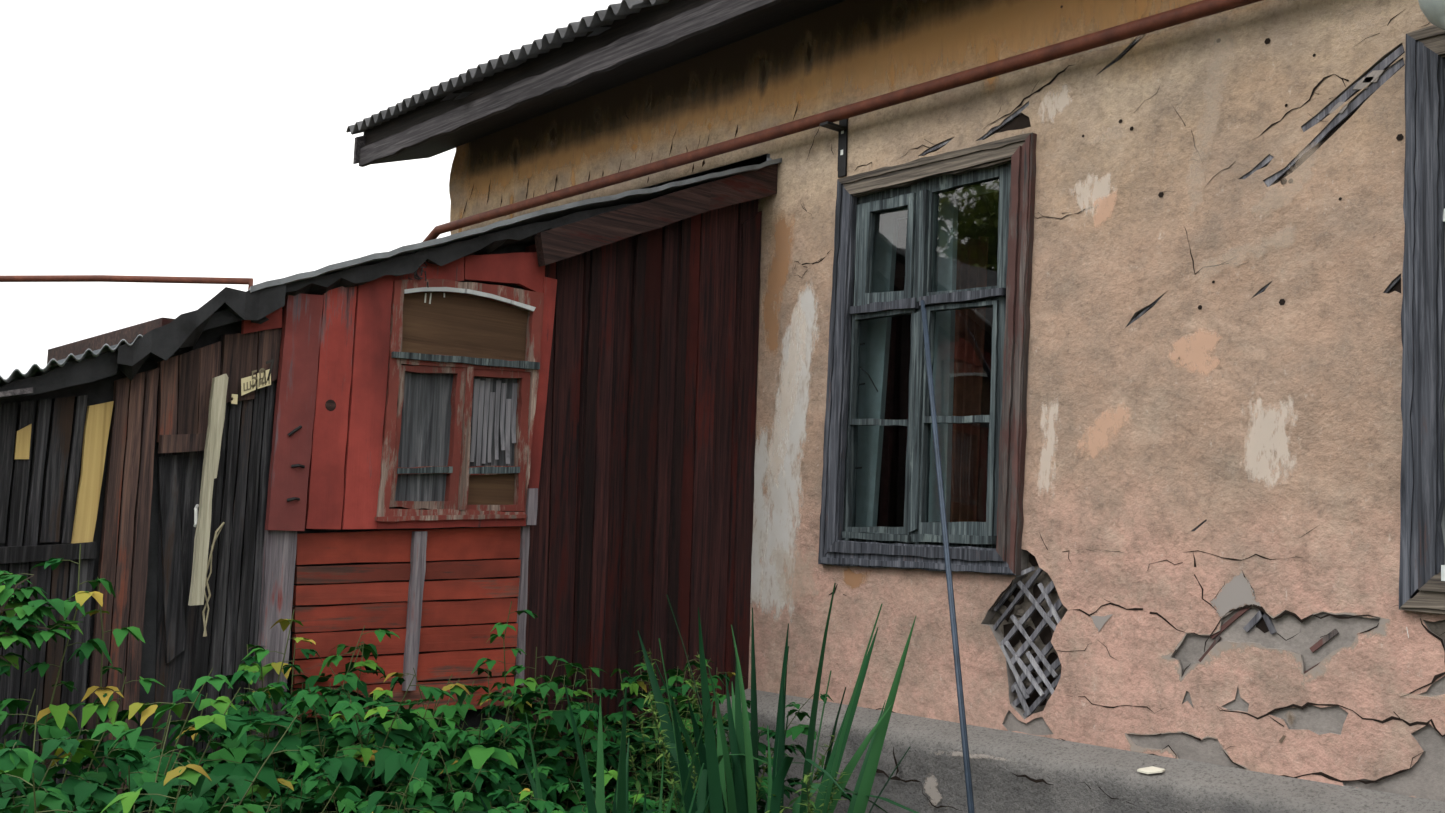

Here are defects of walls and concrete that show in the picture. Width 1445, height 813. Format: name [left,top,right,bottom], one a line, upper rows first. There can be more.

leakage [467,0,1151,218]
crack [988,64,1076,125]
crack [1129,10,1430,193]
crack [1184,227,1248,274]
peeling [751,287,817,619]
peeling [1246,399,1292,485]
spalling [981,549,1068,735]
spalling [1162,572,1390,708]
spalling [1125,731,1250,774]
spalling [1221,688,1249,712]
spalling [1269,705,1348,735]
spalling [1342,724,1445,802]